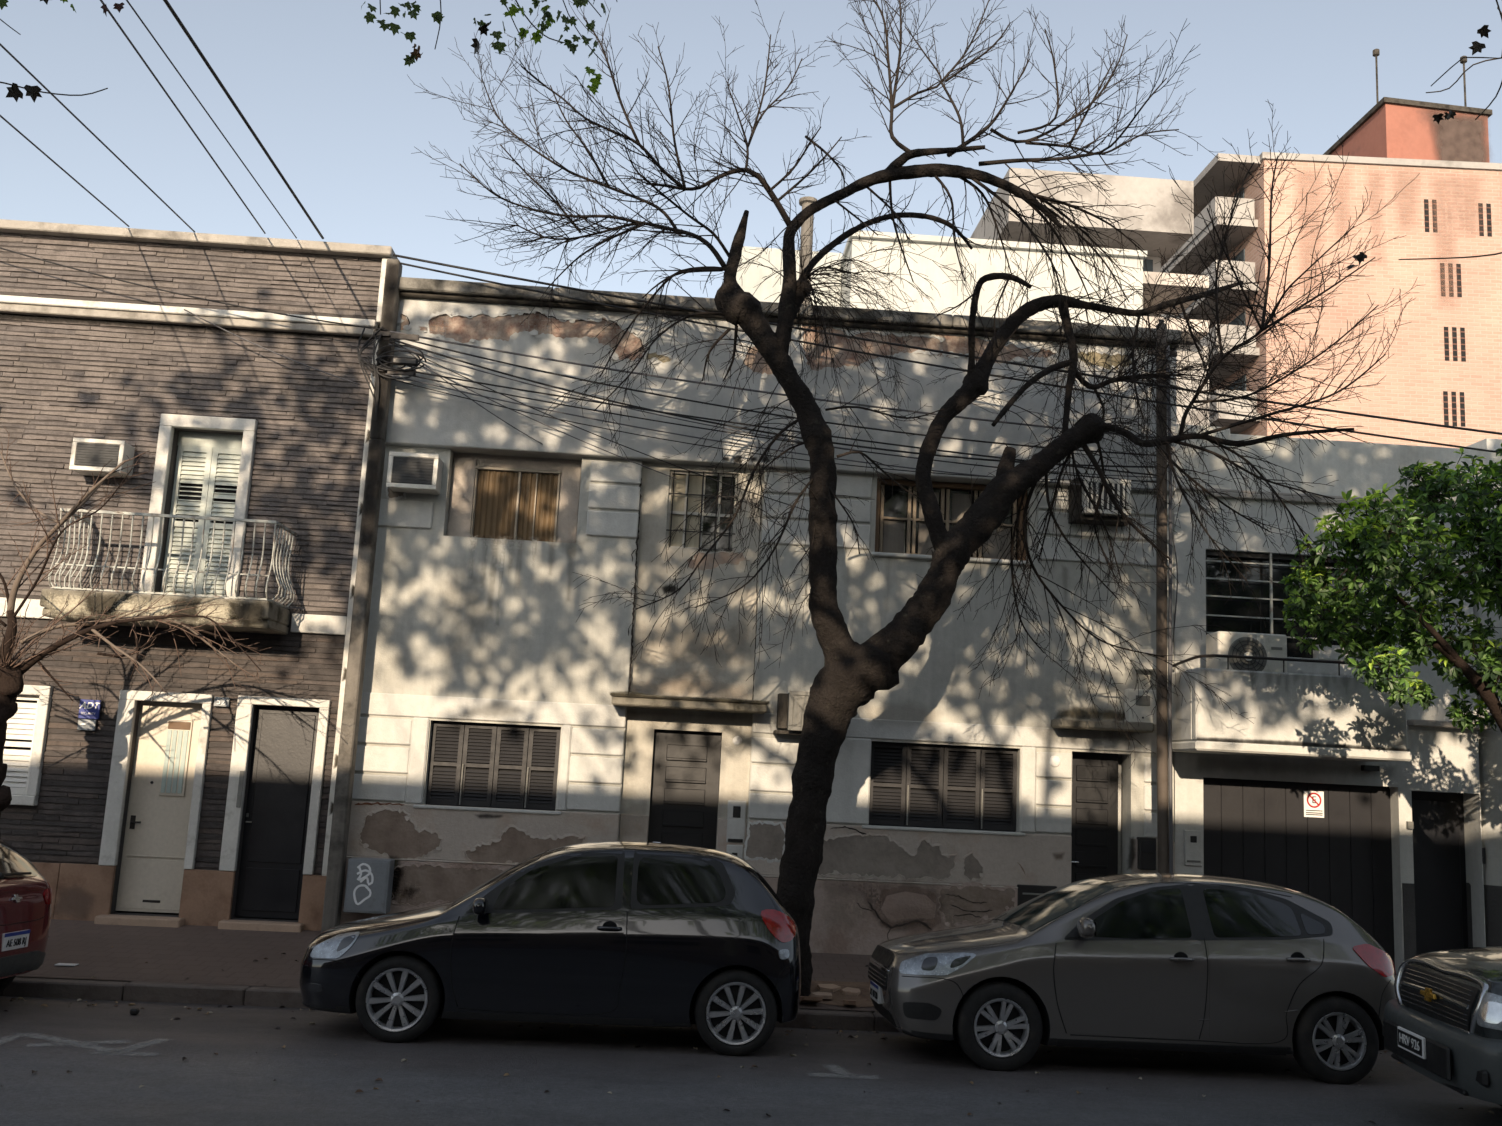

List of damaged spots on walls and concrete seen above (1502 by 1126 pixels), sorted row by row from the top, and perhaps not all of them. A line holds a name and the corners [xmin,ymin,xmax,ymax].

peeling [396,307,678,366]
peeling [737,343,776,380]
peeling [796,324,1059,375]
peeling [1077,346,1138,375]
flaking render [357,807,586,909]
peeling [744,820,785,863]
peeling [817,832,1018,929]